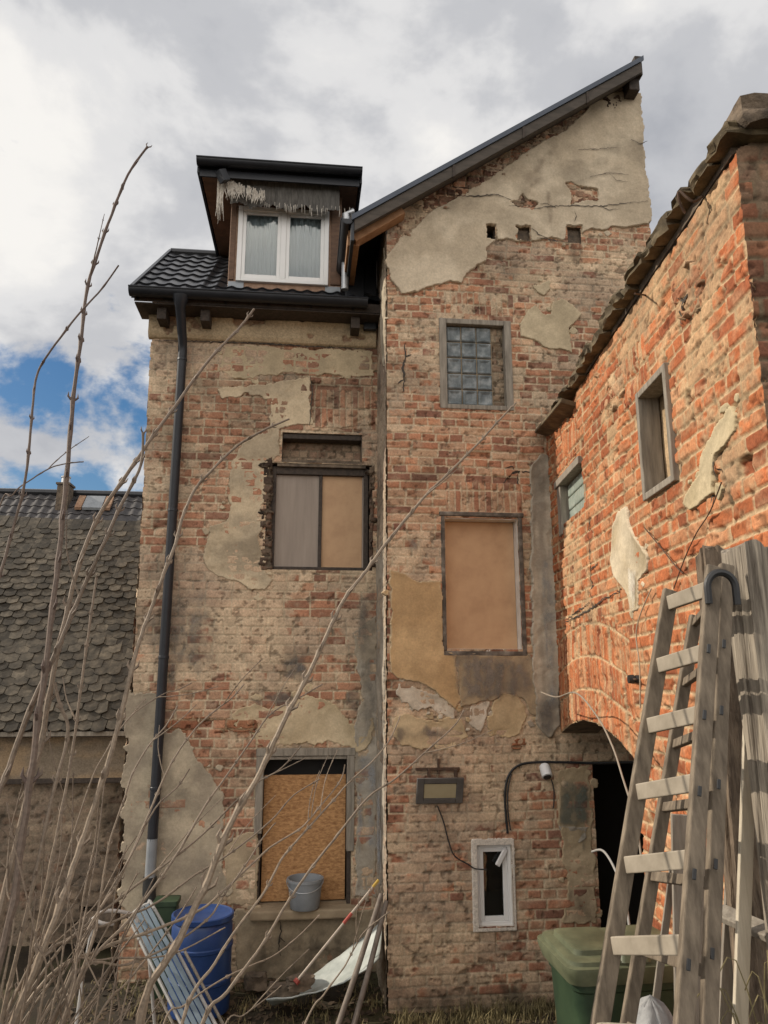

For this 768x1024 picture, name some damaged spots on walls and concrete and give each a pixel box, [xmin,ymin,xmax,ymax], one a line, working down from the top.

crack [467,139,647,242]
crack [398,344,412,392]
flaking render [202,91,652,601]
flaking render [683,393,740,510]
flaking render [610,506,650,619]
flaking render [117,465,536,998]